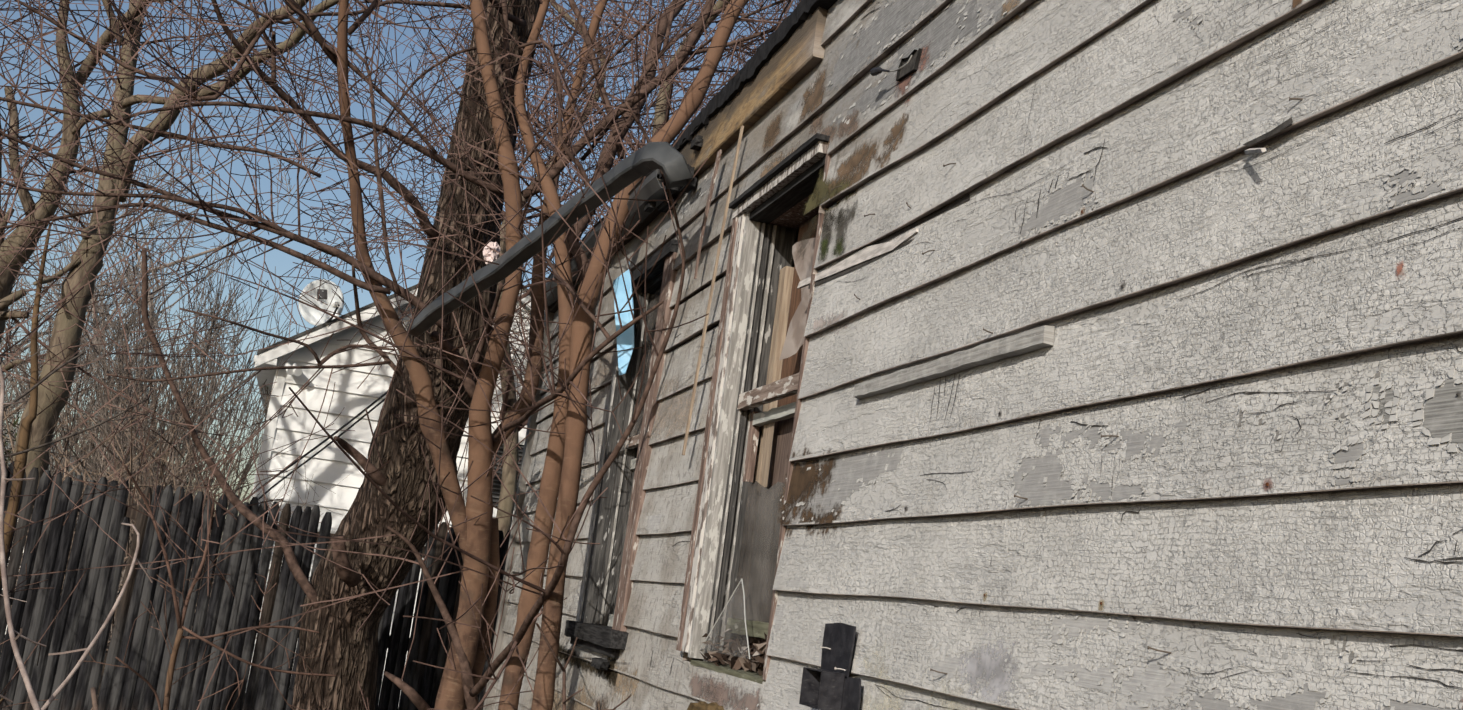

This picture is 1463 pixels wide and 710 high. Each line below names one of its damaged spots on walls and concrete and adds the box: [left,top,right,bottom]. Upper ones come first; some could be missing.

peeling [822,0,1024,132]
damp [760,70,909,260]
crack [1178,217,1463,300]
peeling [780,442,906,524]
crack [1035,419,1141,528]
peeling [1011,418,1191,517]
peeling [1237,409,1283,441]
crack [1181,386,1363,452]
peeling [1322,366,1463,486]
crack [1404,529,1463,564]
damp [690,676,759,710]
crack [1344,644,1463,689]